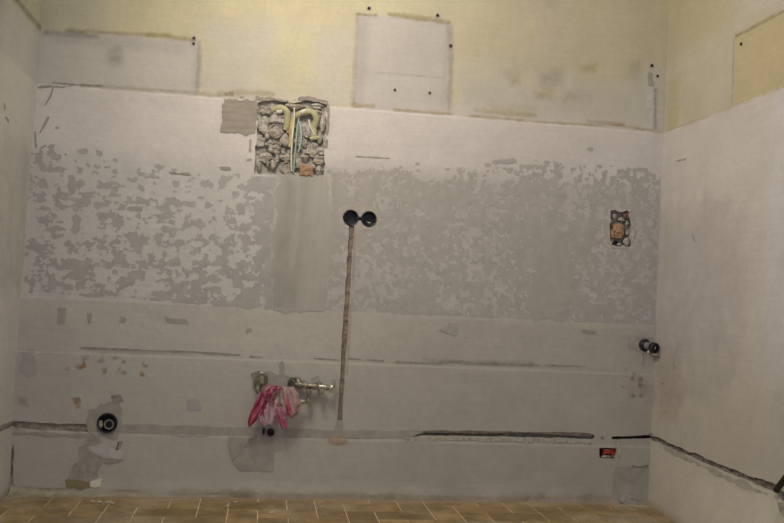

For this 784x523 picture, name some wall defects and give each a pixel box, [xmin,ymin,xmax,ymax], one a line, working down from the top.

flaking render [24,96,660,336]
spalling [65,395,124,490]